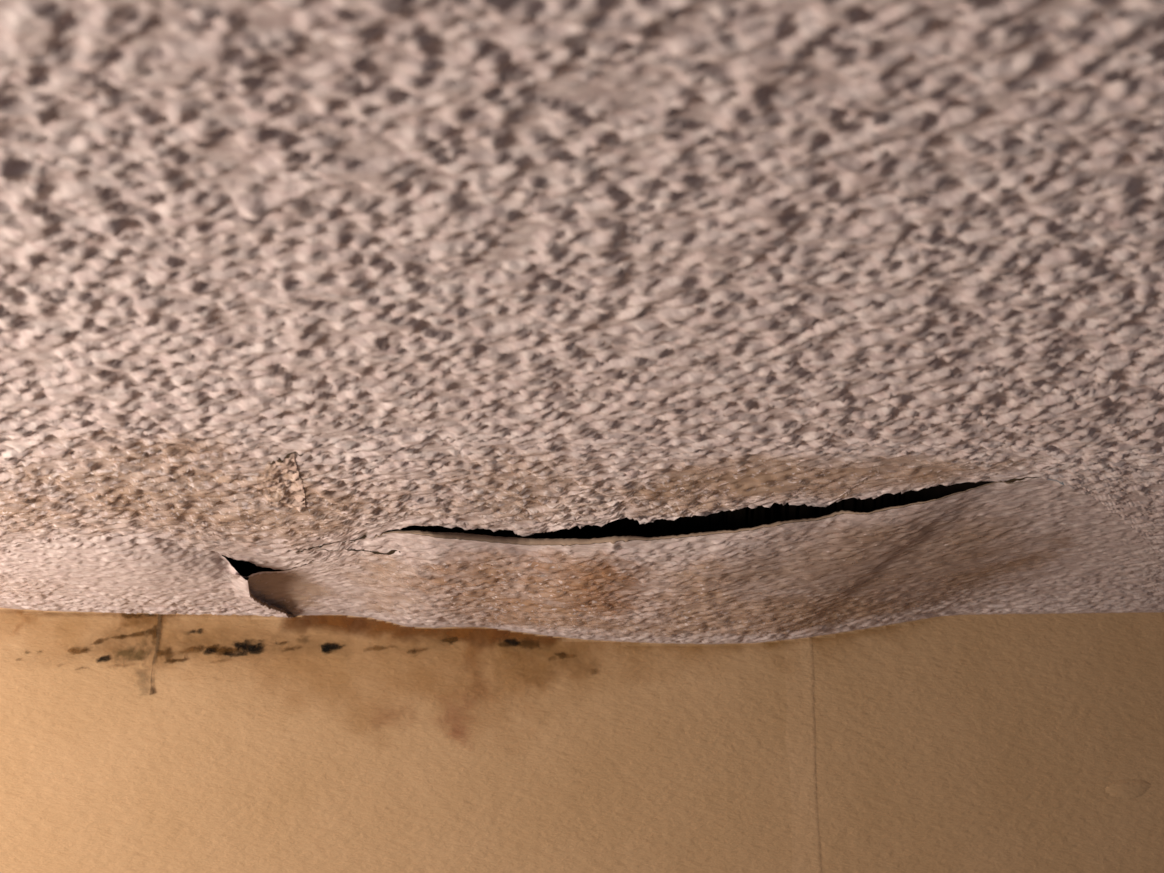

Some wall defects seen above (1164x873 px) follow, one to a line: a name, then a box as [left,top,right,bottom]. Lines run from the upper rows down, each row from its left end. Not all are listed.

crack [269,452,304,465]
water stain [644,461,869,497]
crack [296,477,1038,555]
water stain [431,562,630,624]
water stain [68,613,263,695]
water stain [321,643,341,653]
water stain [498,639,538,648]